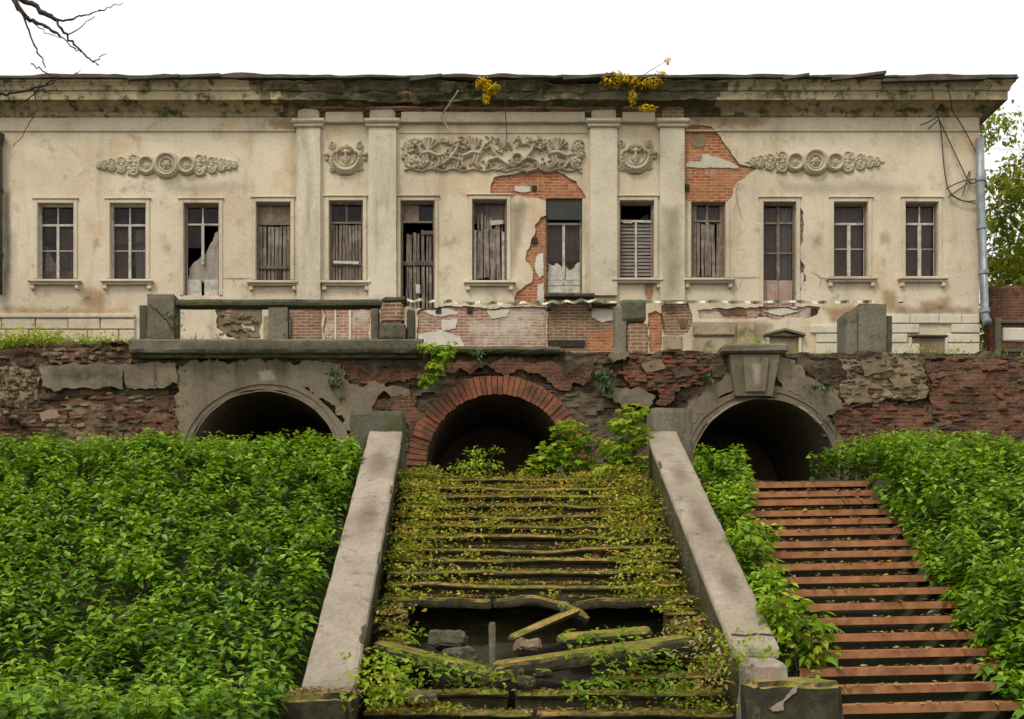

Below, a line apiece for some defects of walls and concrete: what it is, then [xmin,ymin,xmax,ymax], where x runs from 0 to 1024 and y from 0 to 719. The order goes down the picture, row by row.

flaking render [490,171,586,201]
flaking render [685,125,756,202]
flaking render [215,309,262,339]
flaking render [342,215,614,441]
flaking render [616,303,854,408]
flaking render [820,357,1024,449]